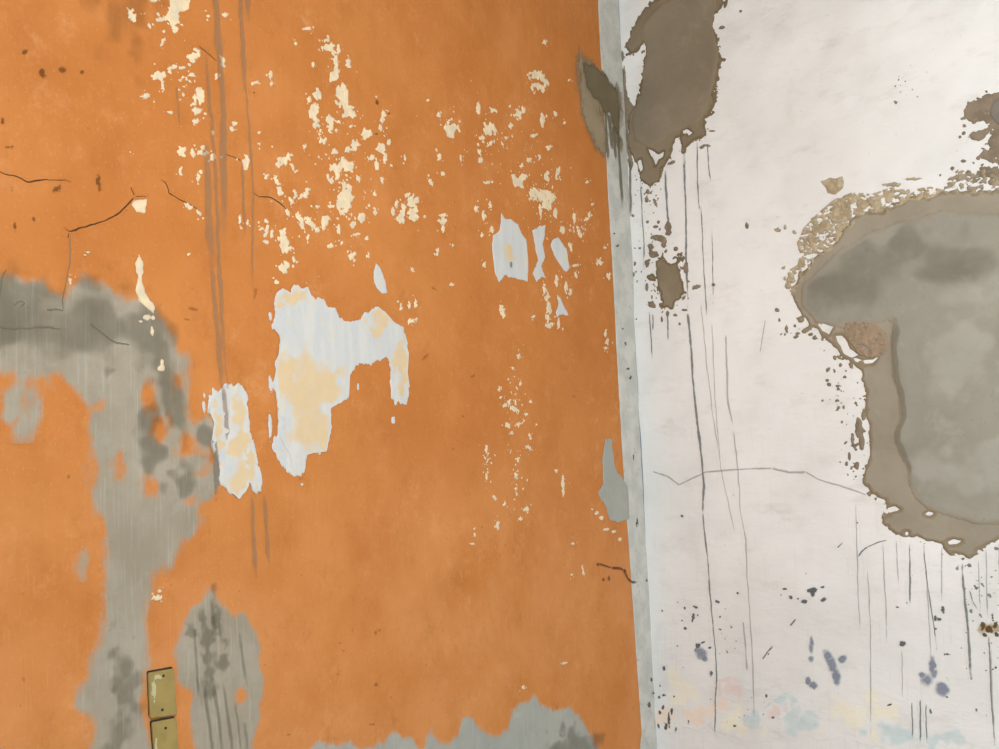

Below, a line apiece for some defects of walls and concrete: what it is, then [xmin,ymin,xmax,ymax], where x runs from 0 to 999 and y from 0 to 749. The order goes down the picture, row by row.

peeling [127,0,207,126]
crack [198,45,217,62]
crack [0,169,72,187]
crack [0,179,200,330]
crack [251,192,287,210]
peeling [238,21,421,486]
peeling [460,70,619,330]
flaking render [774,90,999,296]
crack [91,324,129,345]
peeling [202,382,263,499]
peeling [821,363,868,480]
peeling [309,685,601,749]